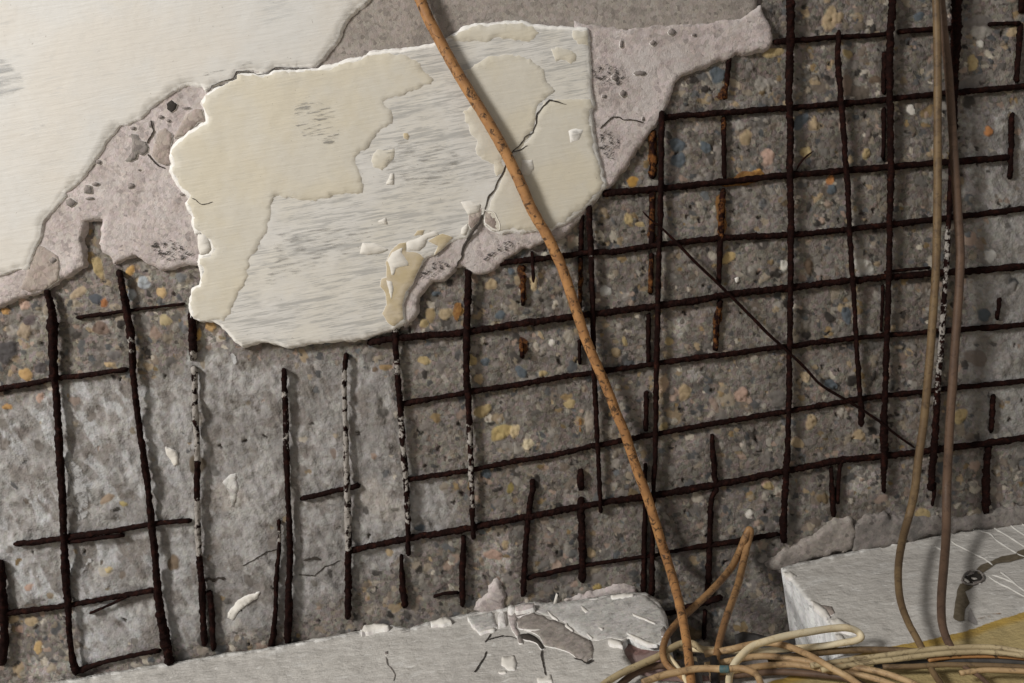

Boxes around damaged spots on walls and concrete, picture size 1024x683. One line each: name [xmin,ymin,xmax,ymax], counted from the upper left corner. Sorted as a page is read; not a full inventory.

spalling [0,86,684,683]
peeling [317,0,435,68]
crack [456,99,563,267]
spalling [427,0,934,656]
rust [715,170,764,233]
spalling [914,0,1024,518]